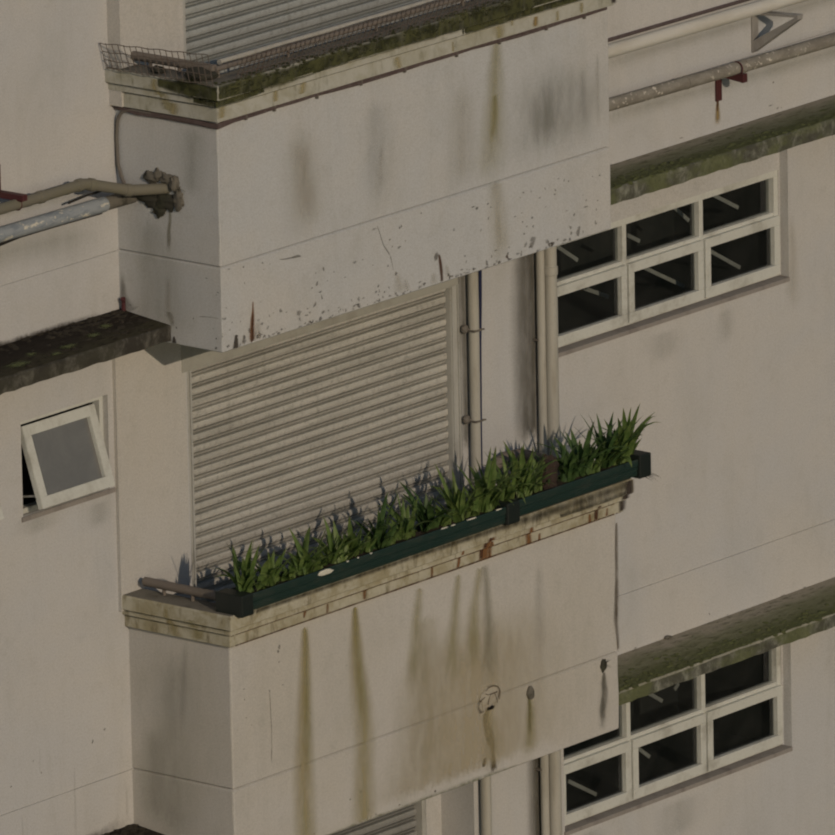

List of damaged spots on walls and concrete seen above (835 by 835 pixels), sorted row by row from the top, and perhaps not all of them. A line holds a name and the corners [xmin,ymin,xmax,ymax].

rust [231,504,621,820]